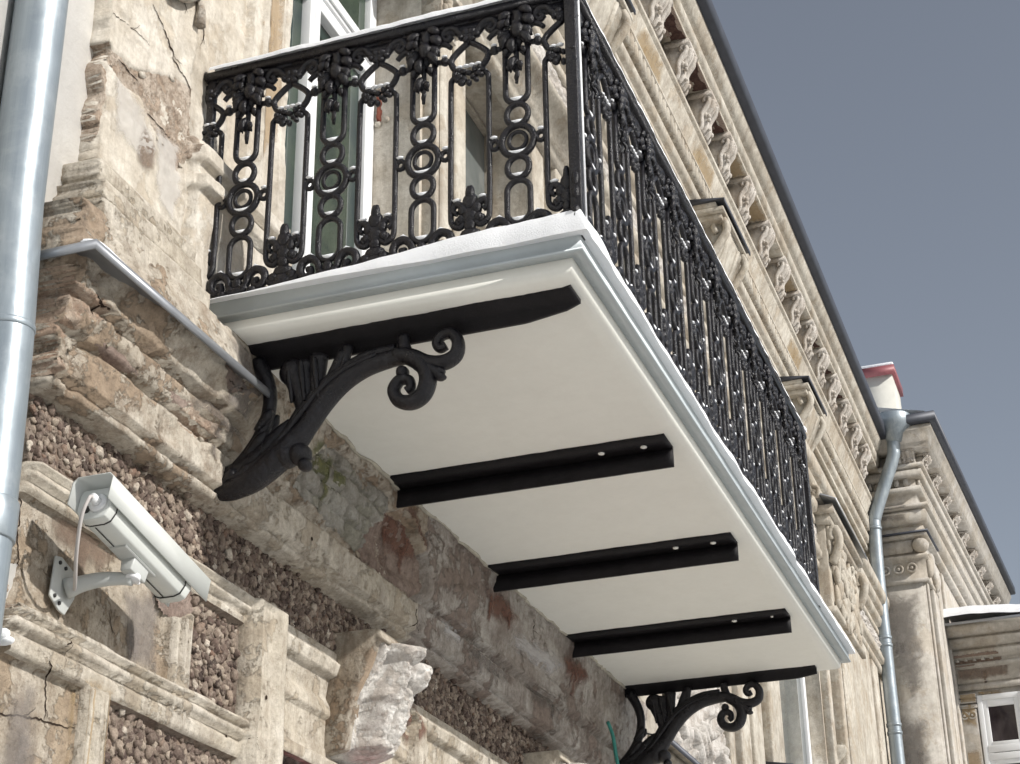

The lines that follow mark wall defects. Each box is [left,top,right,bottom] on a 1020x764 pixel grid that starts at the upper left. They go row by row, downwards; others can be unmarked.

crack [114,5,191,91]
spalling [80,42,204,213]
crack [0,638,74,729]